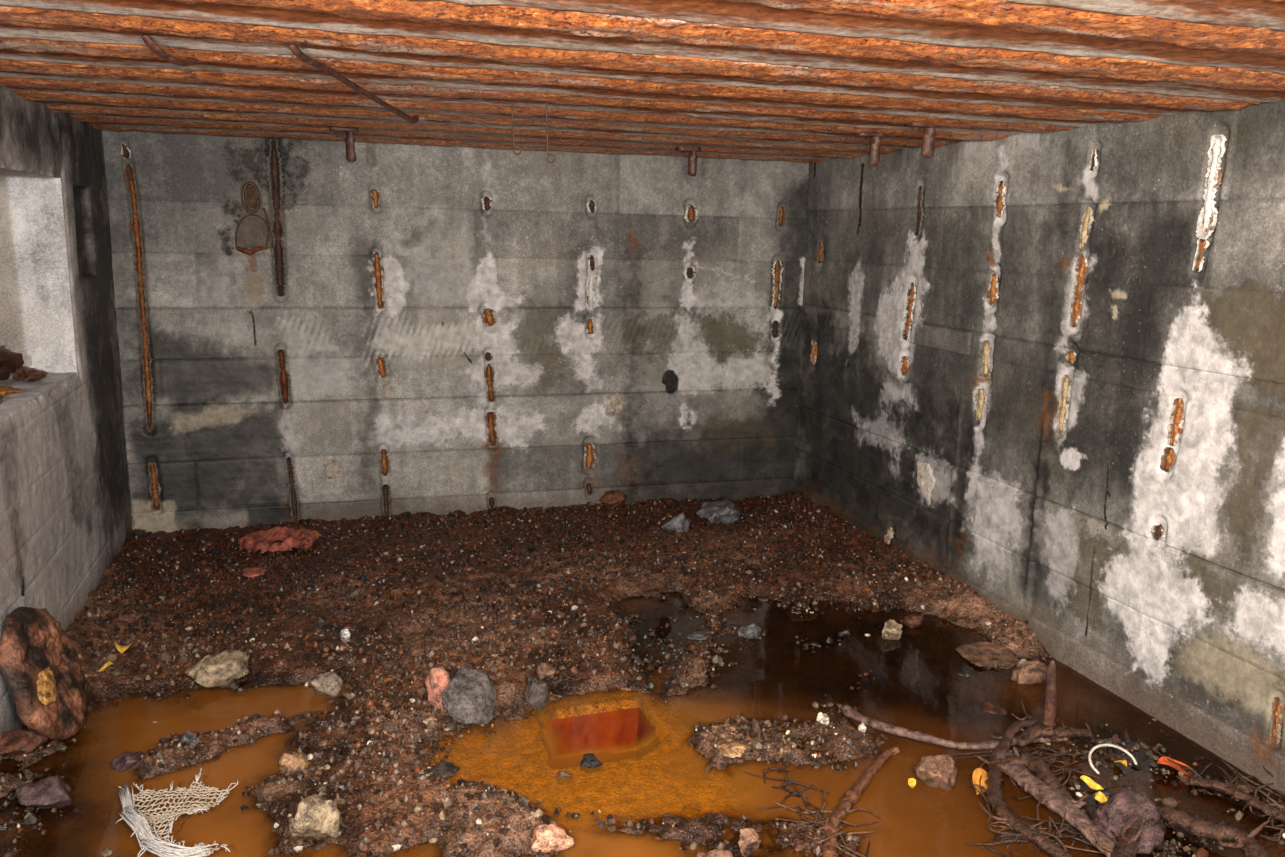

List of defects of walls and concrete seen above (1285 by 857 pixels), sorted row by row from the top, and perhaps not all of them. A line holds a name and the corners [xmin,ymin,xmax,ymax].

spalling [120,144,155,430]
rust [236,246,268,271]
spalling [265,139,288,297]
water stain [361,252,545,448]
spalling [484,352,499,446]
water stain [554,186,1095,593]
water stain [989,145,1009,275]
spalling [1070,206,1094,327]
water stain [1082,161,1110,212]
spalling [1160,398,1184,472]
water stain [1098,284,1285,682]
spalling [1192,134,1227,272]